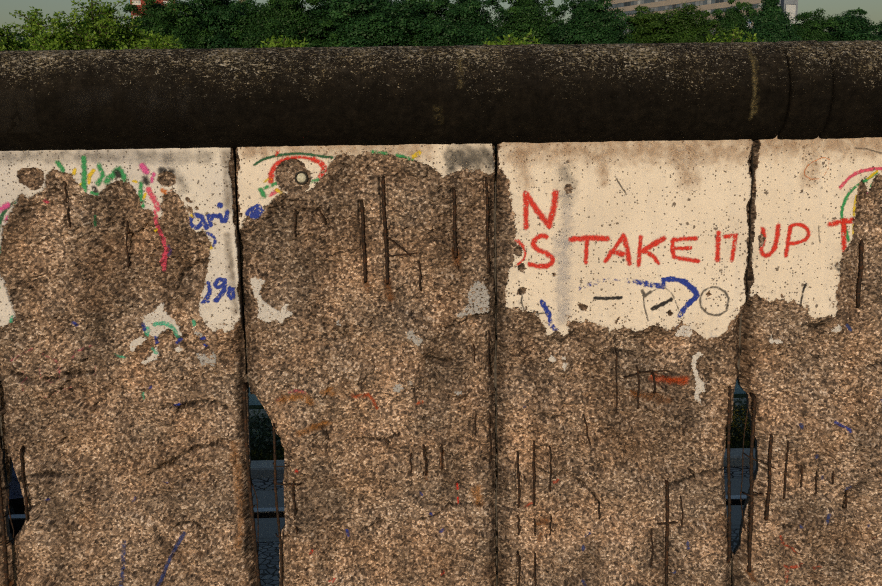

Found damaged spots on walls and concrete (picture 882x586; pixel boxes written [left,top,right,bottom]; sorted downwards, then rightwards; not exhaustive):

spalling [0,140,882,586]